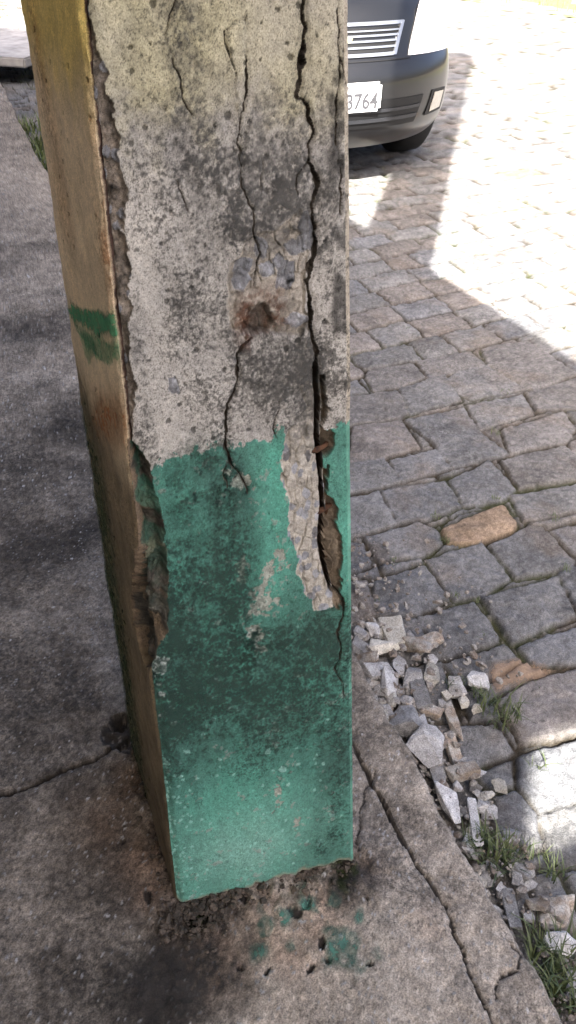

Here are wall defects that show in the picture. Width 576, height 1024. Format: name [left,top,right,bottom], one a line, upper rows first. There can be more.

crack [223,16,264,286]
crack [293,0,346,369]
spalling [82,0,170,671]
crack [222,337,253,494]
spalling [235,363,343,655]
crack [333,590,346,697]